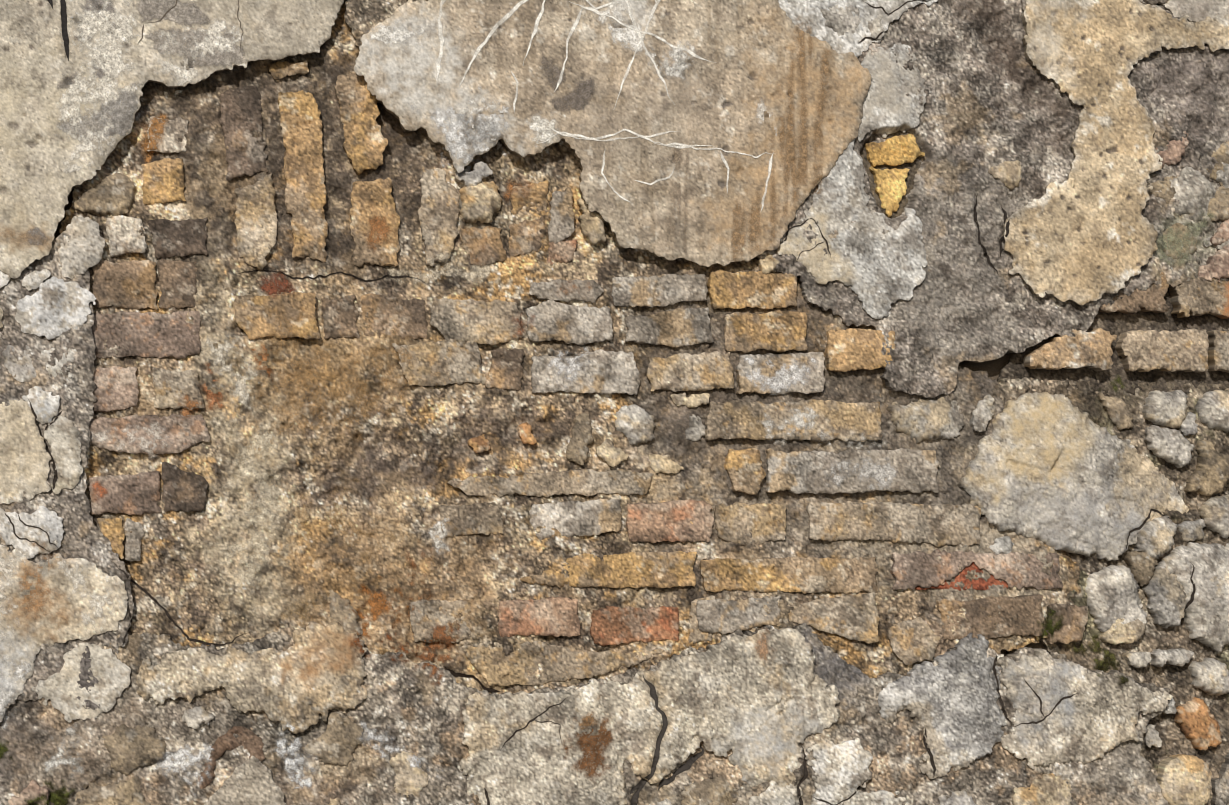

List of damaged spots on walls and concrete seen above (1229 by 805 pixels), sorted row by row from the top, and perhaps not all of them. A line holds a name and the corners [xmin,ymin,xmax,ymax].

spalling [57,0,1119,694]
crack [630,676,704,805]
spalling [958,44,1229,805]
spalling [1139,0,1195,23]